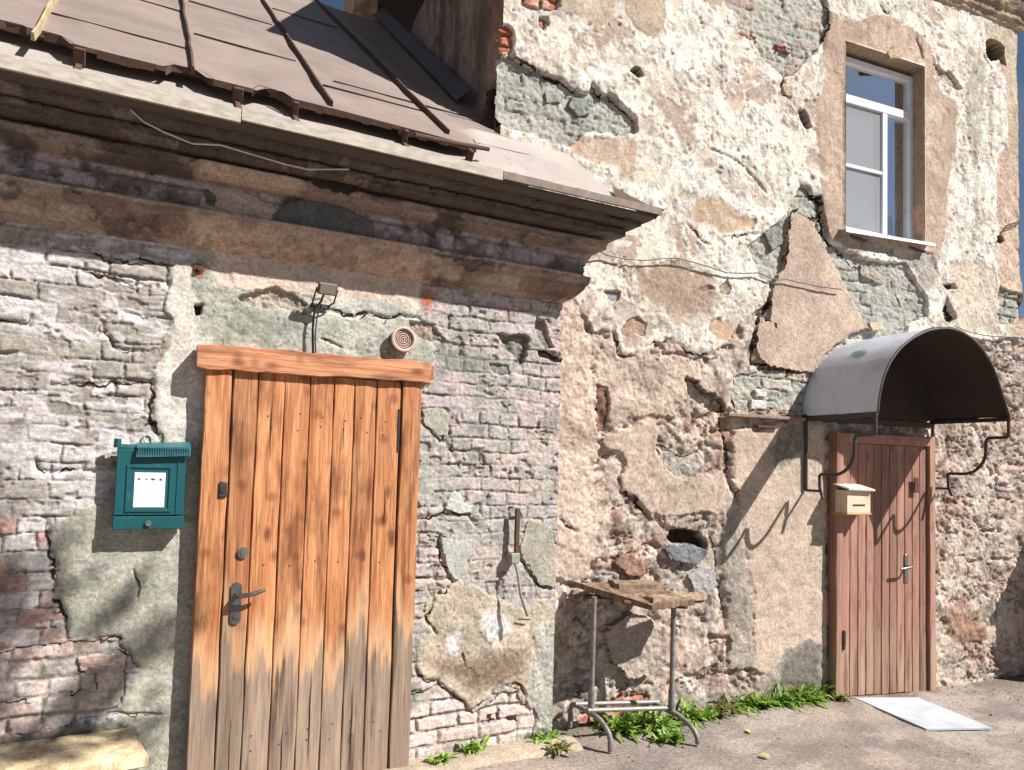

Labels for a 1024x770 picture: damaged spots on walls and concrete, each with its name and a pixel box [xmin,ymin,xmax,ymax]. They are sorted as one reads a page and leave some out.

spalling [485,26,635,147]
crack [81,248,167,286]
crack [317,308,429,326]
peeling [731,188,925,412]
spalling [489,320,563,375]
crack [55,373,164,442]
spalling [596,385,608,432]
peeling [445,491,473,514]
crack [96,635,135,664]
crack [1,665,98,704]
spalling [0,640,126,735]
spalling [409,684,539,759]